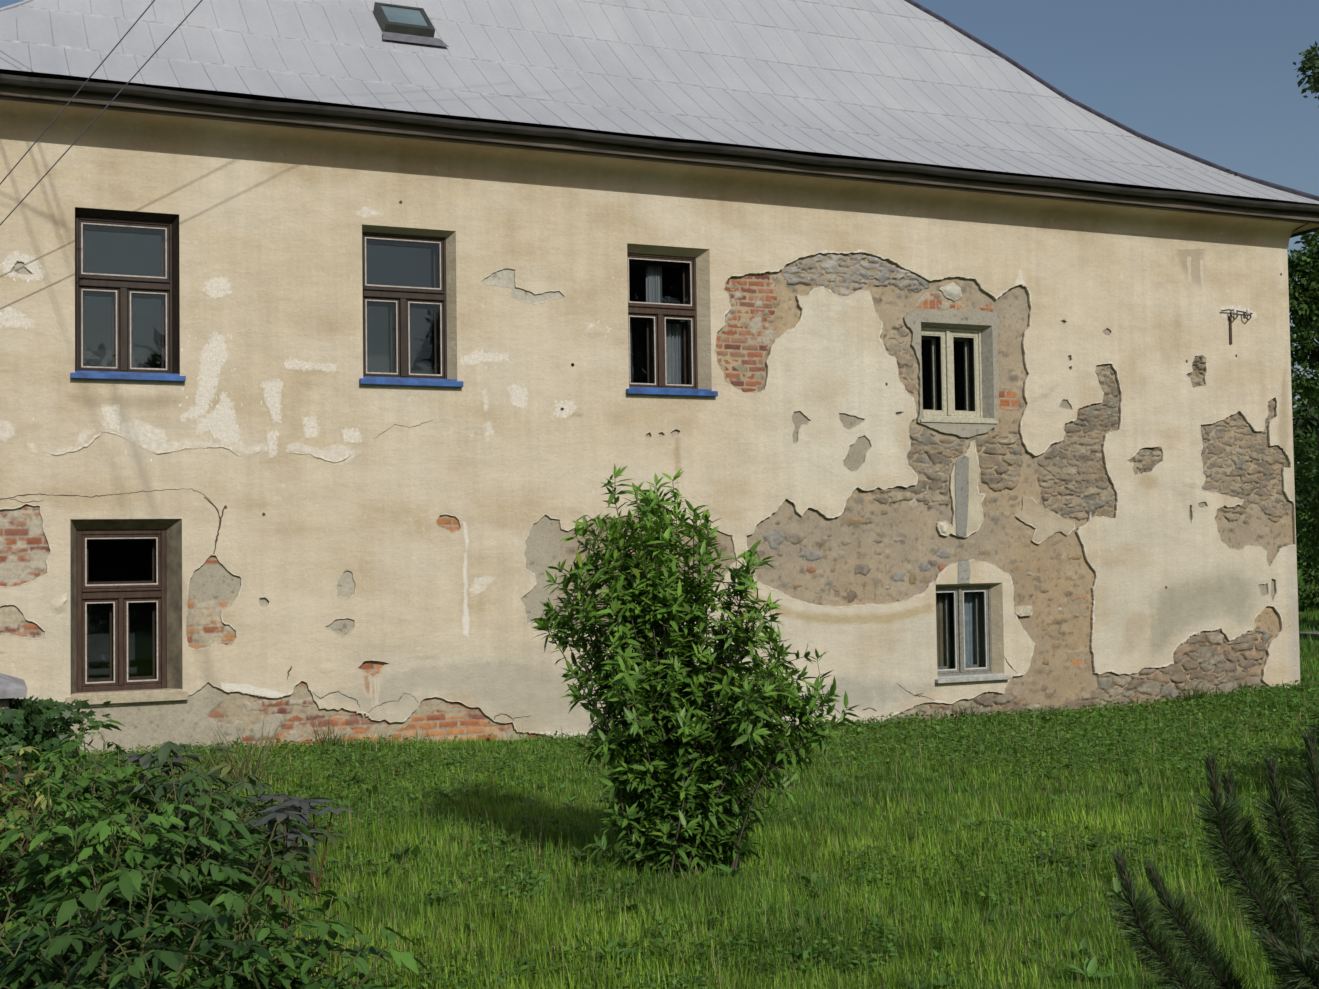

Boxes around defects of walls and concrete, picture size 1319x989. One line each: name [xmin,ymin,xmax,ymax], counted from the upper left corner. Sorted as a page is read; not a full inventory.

flaking render [482,268,565,304]
flaking render [0,503,51,587]
crack [0,488,225,554]
flaking render [436,513,461,532]
flaking render [521,249,1296,722]
flaking render [0,605,46,640]
flaking render [186,555,243,651]
flaking render [68,681,598,754]